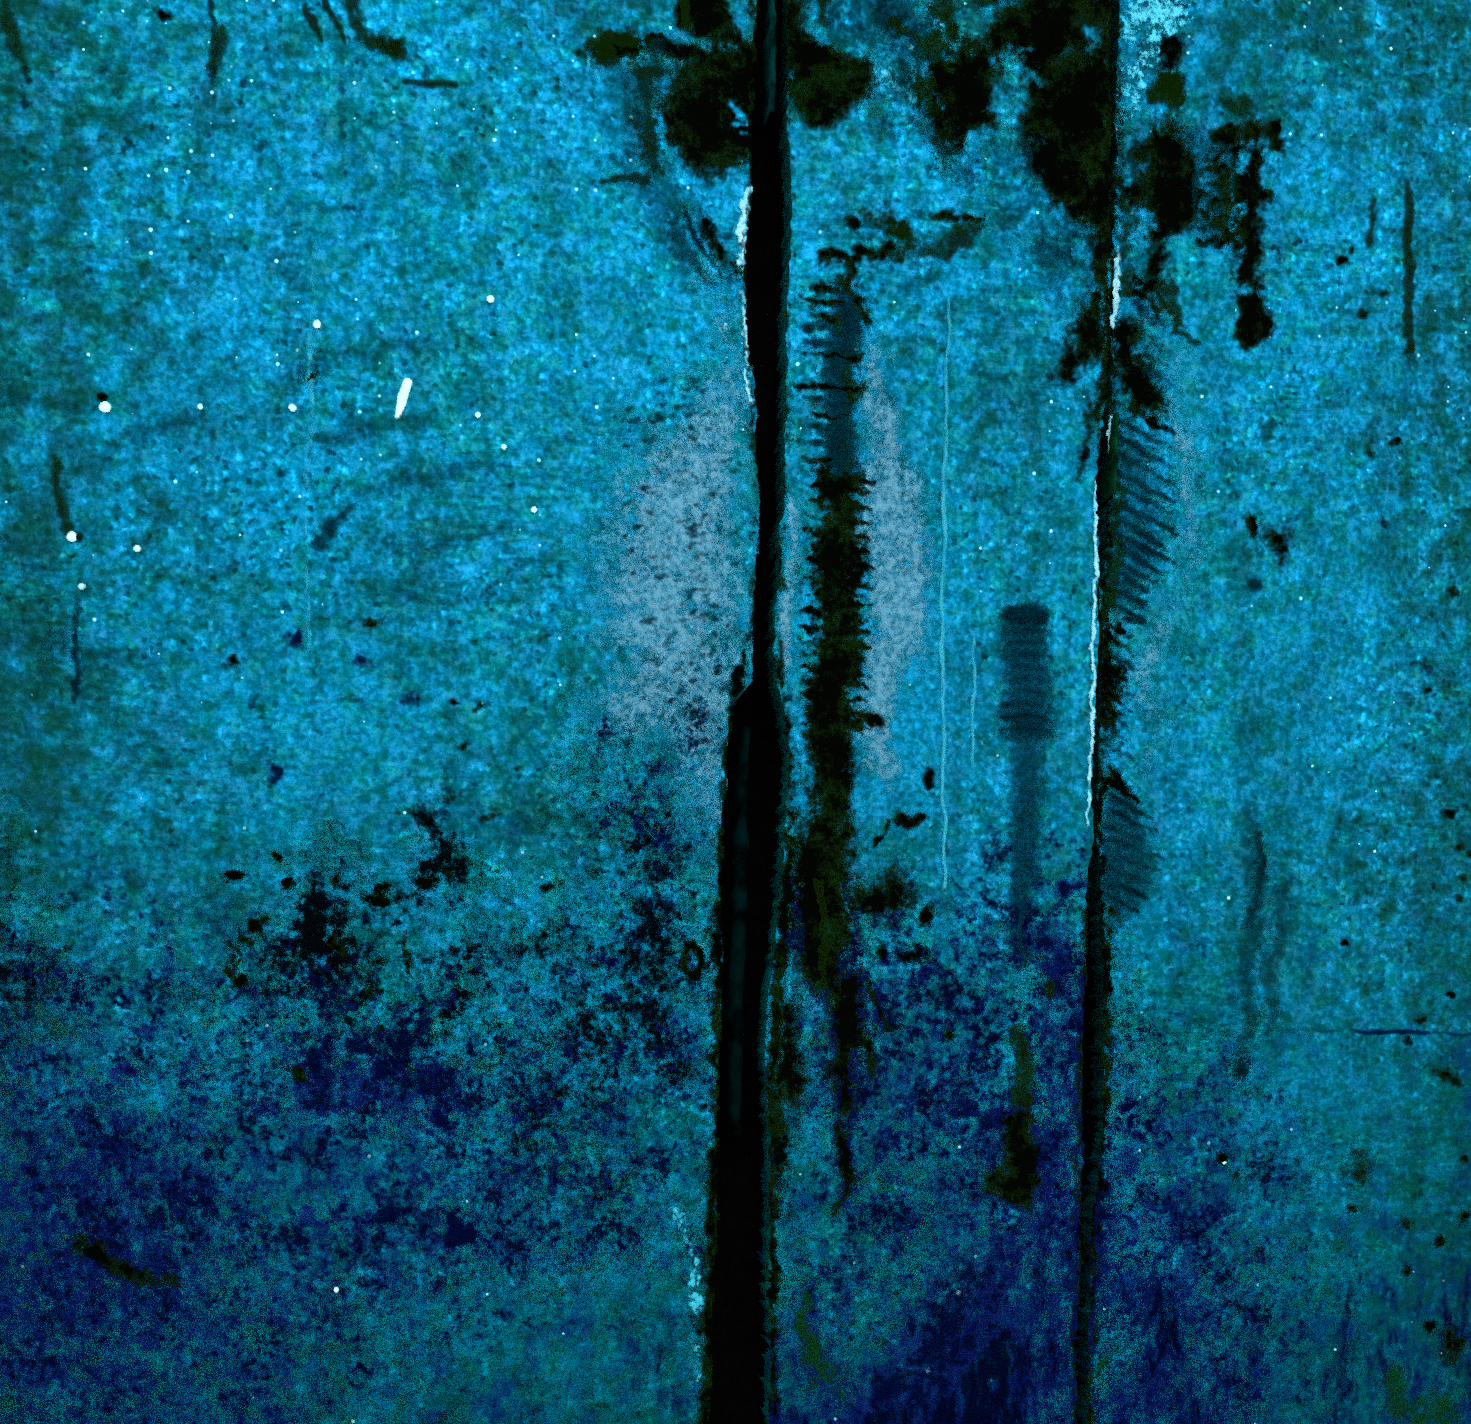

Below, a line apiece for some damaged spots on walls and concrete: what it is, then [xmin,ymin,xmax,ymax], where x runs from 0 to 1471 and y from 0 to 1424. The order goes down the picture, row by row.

damp [591,0,717,184]
damp [787,0,827,61]
damp [881,0,1009,107]
damp [1193,162,1240,250]
damp [720,516,757,803]
crack [708,0,787,1424]
damp [766,290,869,1424]
damp [1000,603,1053,965]
crack [1094,412,1119,555]
damp [1067,0,1201,1424]
damp [696,826,724,1424]
crack [1074,892,1100,1424]